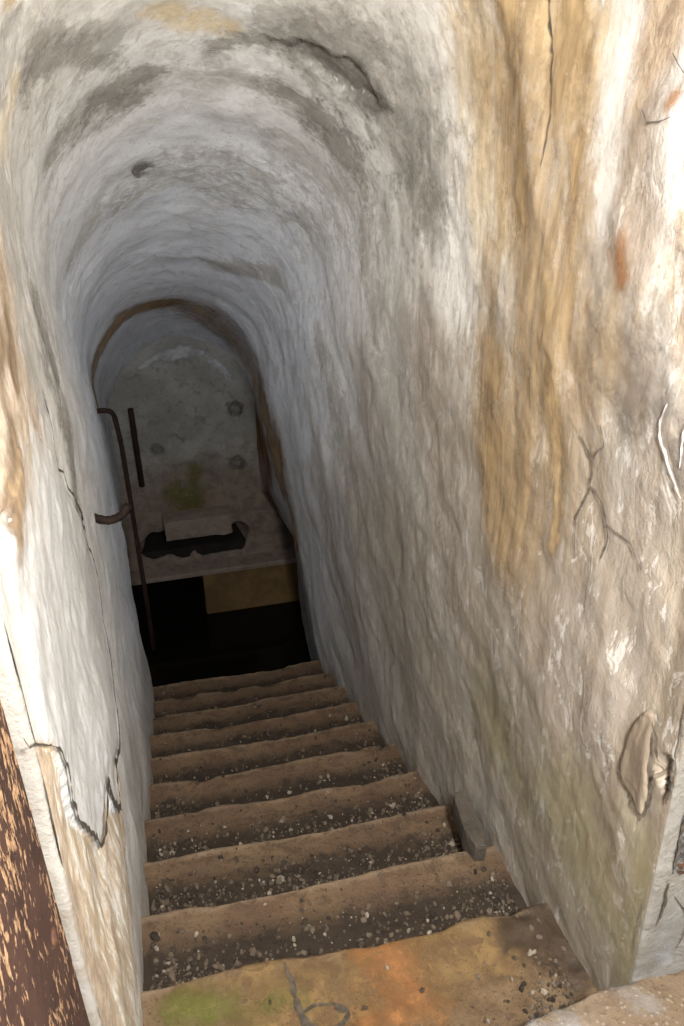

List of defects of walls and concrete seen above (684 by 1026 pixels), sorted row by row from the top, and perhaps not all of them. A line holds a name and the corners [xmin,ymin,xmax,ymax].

leakage [19,31,118,109]
leakage [86,66,166,120]
leakage [206,1,448,237]
leakage [596,0,637,235]
leakage [0,300,20,396]
leakage [4,424,26,554]
crack [574,425,641,569]
crack [23,391,122,848]
spalling [673,816,684,876]